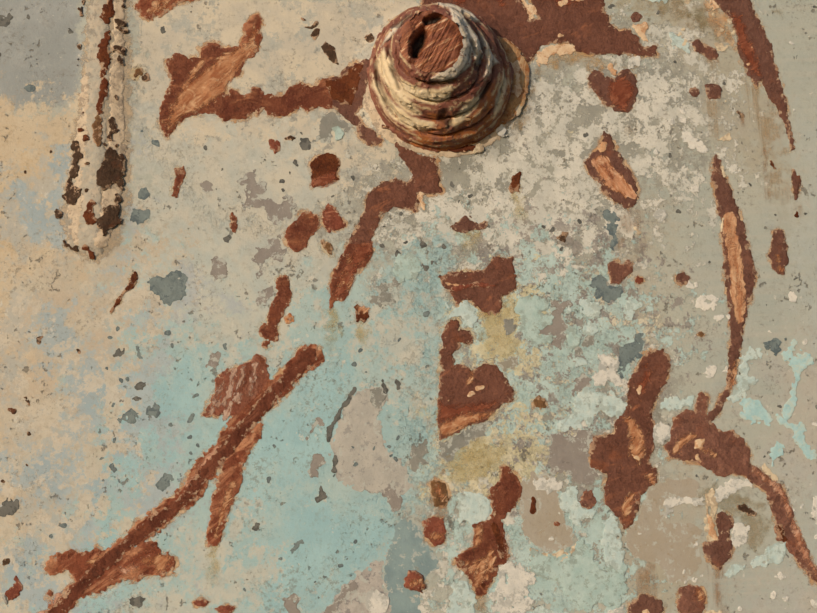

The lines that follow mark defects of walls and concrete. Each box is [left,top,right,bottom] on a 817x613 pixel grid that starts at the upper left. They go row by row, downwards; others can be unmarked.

corrosion [54,0,199,236]
corrosion [157,12,390,147]
corrosion [420,0,659,113]
corrosion [283,142,445,309]
peeling [600,209,620,251]
peeling [445,300,478,328]
corrosion [579,154,817,585]
peeling [305,379,493,613]
corrosion [452,465,522,599]
peeling [487,274,753,613]
peeling [724,542,786,581]
peeling [762,441,785,481]